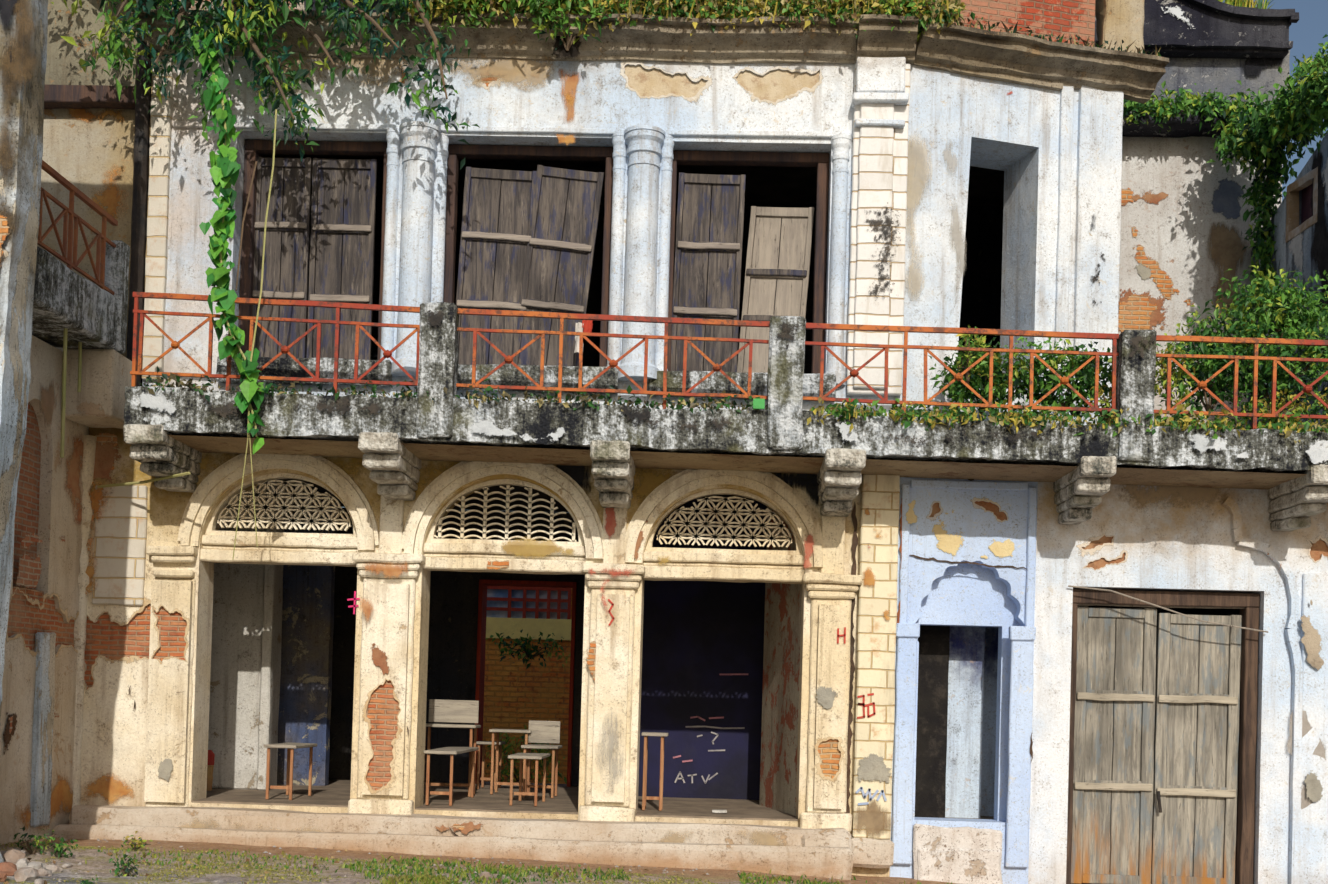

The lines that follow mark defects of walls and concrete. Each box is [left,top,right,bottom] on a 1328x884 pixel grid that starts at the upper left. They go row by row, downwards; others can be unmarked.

leakage [0,0,35,179]
flaking render [620,61,713,102]
flaking render [732,65,823,105]
leakage [0,201,16,237]
flaking render [1121,188,1168,206]
leakage [1311,152,1328,318]
flaking render [1118,227,1195,334]
flaking render [1076,534,1128,570]
flaking render [1304,535,1328,563]
flaking render [6,533,190,692]
flaking render [362,643,403,794]
flaking render [813,736,845,782]